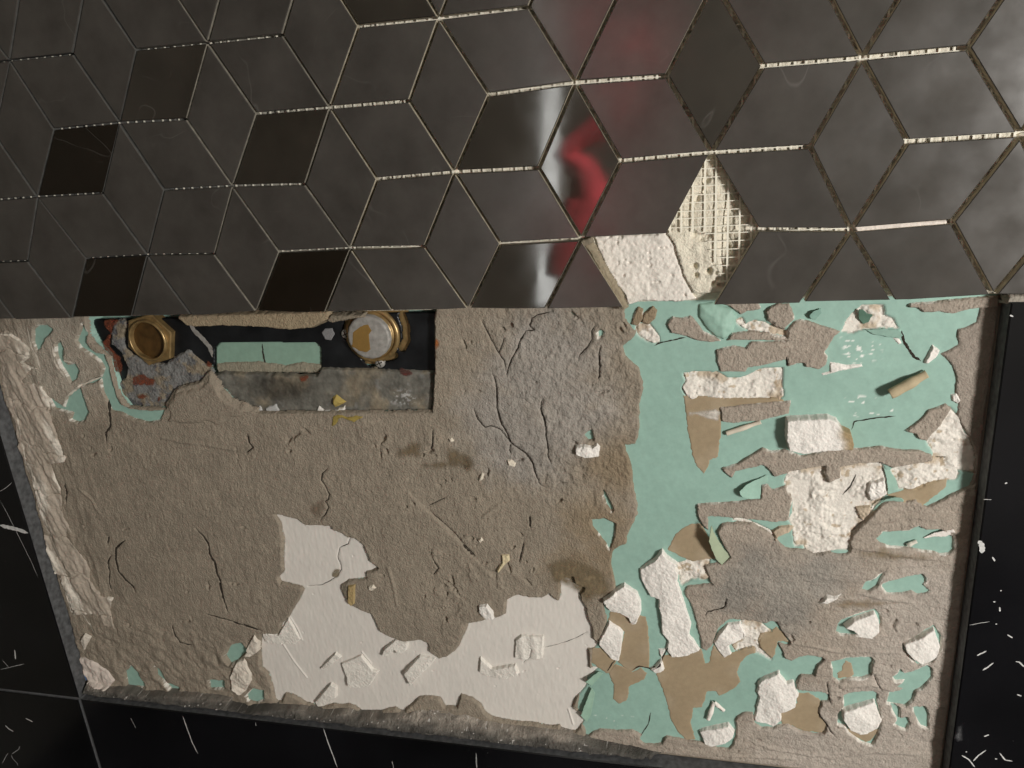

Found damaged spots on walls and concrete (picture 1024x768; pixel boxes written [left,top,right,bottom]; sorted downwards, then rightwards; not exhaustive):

flaking render [595,233,696,304]
flaking render [736,317,786,335]
flaking render [842,304,901,344]
crack [474,312,551,487]
flaking render [682,367,784,473]
flaking render [0,330,115,629]
flaking render [784,393,974,553]
crack [107,537,135,590]
crack [198,531,259,630]
flaking render [262,514,789,740]
leakage [552,562,608,598]
peeling [781,692,826,732]